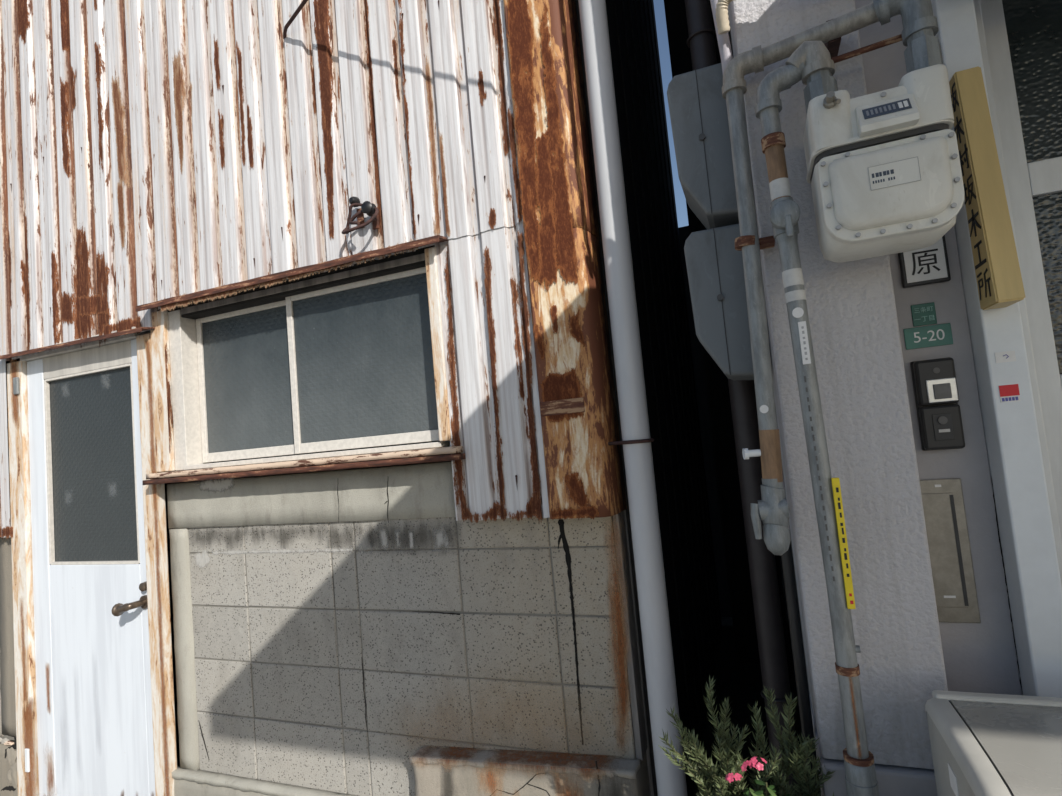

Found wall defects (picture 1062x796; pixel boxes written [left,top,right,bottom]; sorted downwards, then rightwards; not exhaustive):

rust [17,0,30,45]
rust [60,0,76,178]
rust [94,42,129,247]
rust [160,0,422,311]
rust [8,211,31,350]
rust [426,0,599,523]
rust [165,344,173,453]
rust [51,222,170,796]
rust [20,603,53,796]
crack [490,773,550,796]
rust [481,749,614,796]
crack [558,519,601,796]